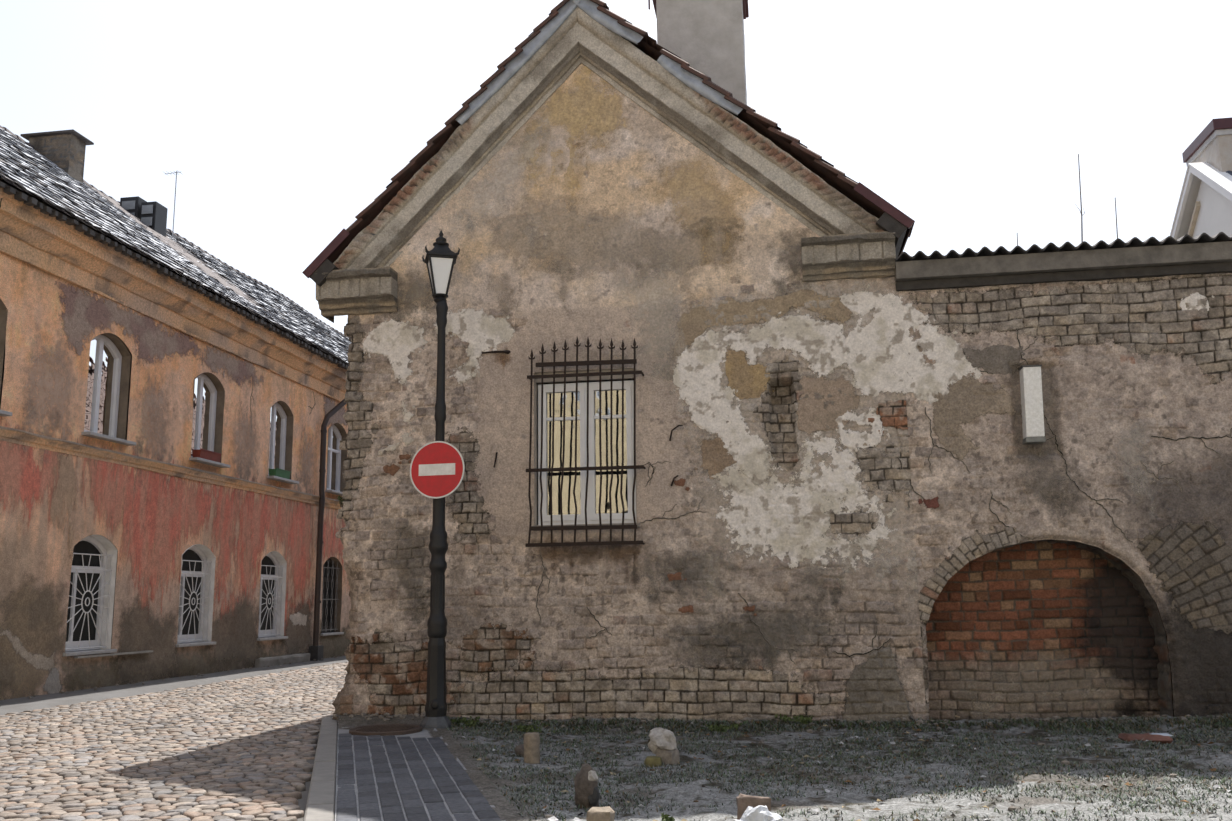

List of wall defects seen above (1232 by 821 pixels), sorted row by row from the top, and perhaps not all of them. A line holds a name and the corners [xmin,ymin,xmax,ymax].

peeling [0,421,60,521]
spalling [316,308,515,575]
spalling [670,273,1232,580]
crack [1039,410,1133,543]
crack [1140,428,1232,492]
spalling [289,612,307,626]
spalling [349,628,428,715]
spalling [447,619,839,721]